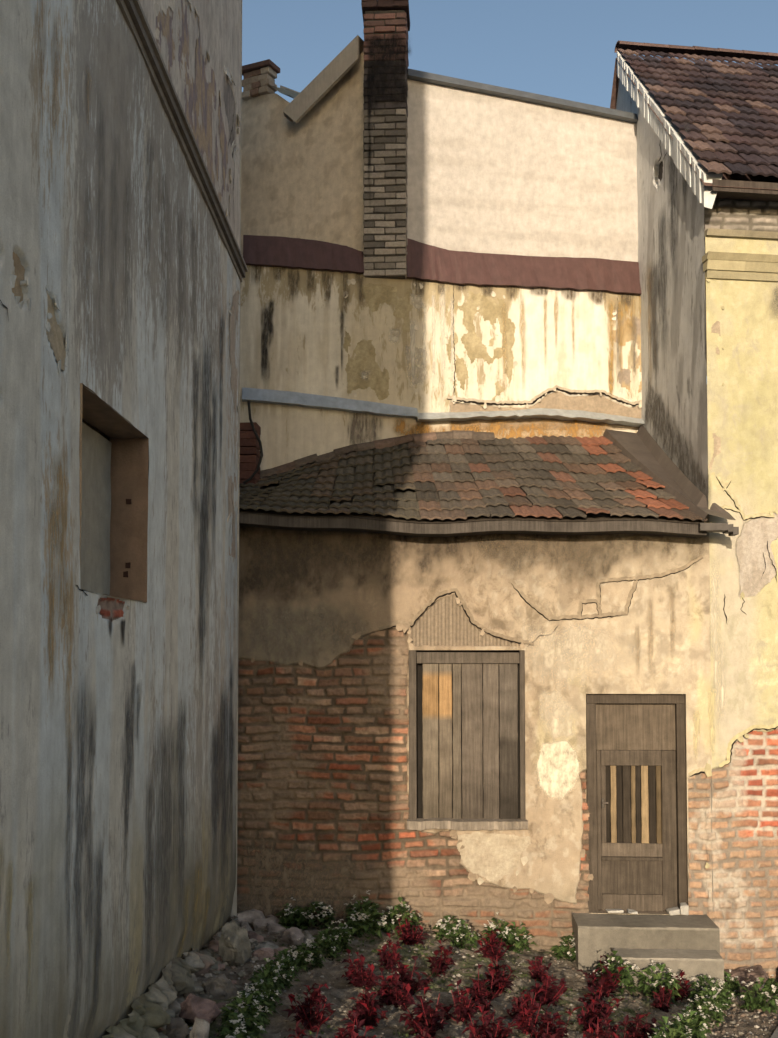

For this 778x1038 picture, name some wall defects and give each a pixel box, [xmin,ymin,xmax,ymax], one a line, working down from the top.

peeling [154,0,240,218]
flaking render [444,291,642,431]
crack [447,288,642,406]
leakage [650,159,685,368]
crack [379,555,703,646]
crack [716,475,777,581]
flaking render [735,508,778,600]
leakage [67,699,103,999]
leakage [125,674,141,848]
leakage [212,669,234,852]
flaking render [237,621,593,957]
flaking render [666,729,778,982]